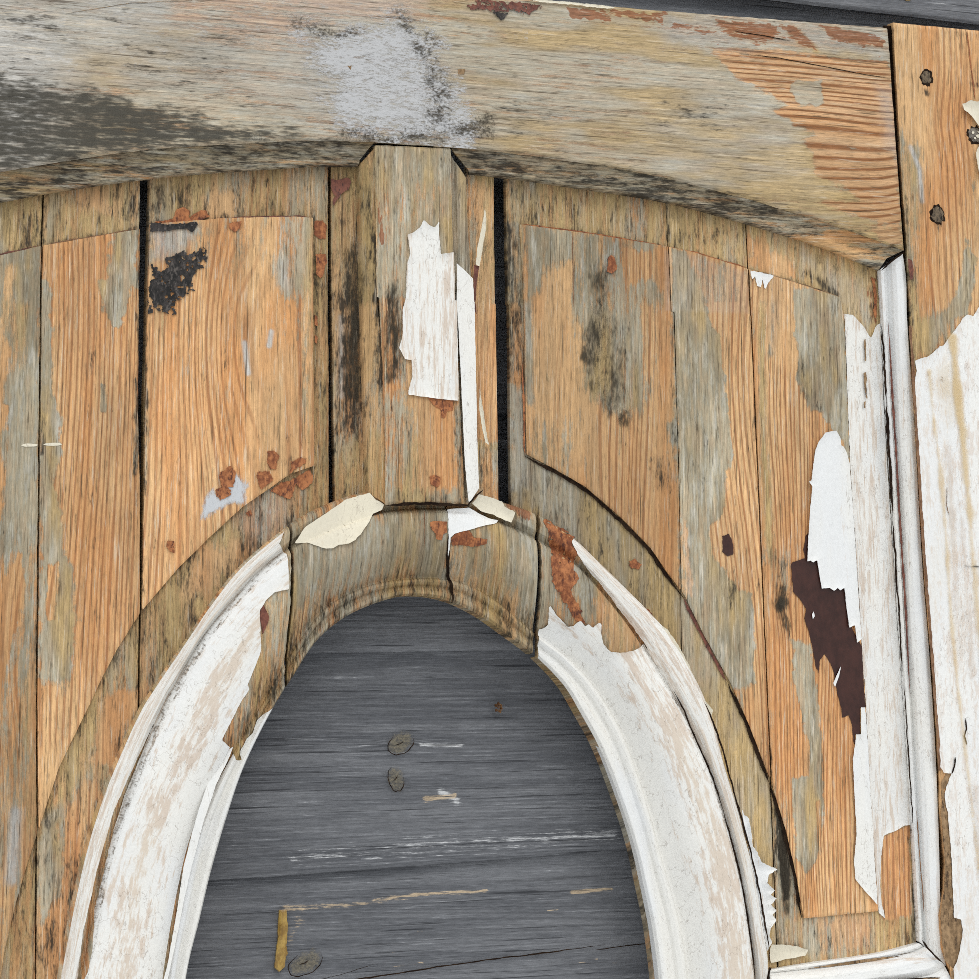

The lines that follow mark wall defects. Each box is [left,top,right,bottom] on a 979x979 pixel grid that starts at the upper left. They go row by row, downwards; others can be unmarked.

peeling [61,532,289,979]
peeling [295,493,384,549]
peeling [399,210,515,554]
peeling [522,365,808,979]
peeling [791,277,911,918]
peeling [915,308,979,979]